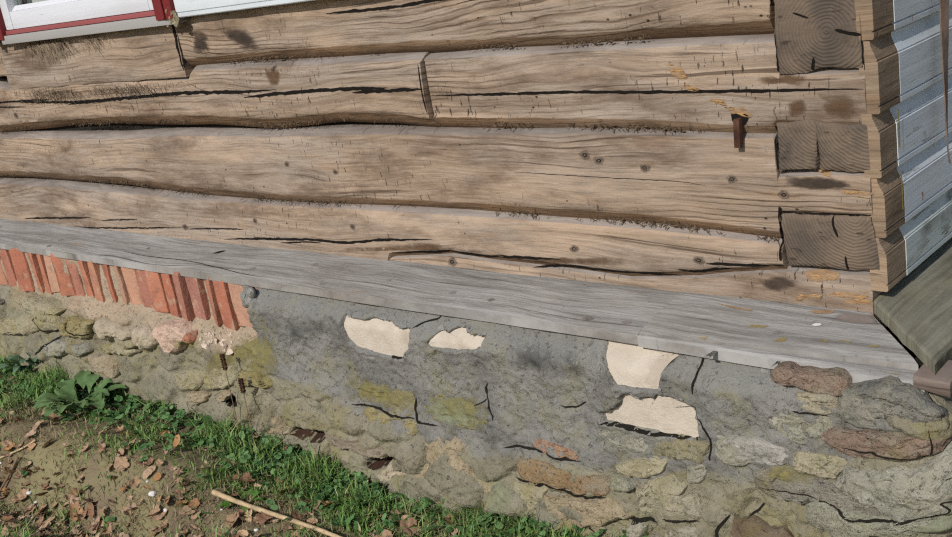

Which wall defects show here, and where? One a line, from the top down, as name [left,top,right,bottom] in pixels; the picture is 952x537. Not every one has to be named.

crack [326,0,443,14]
crack [835,28,861,36]
crack [0,58,856,108]
crack [24,217,783,277]
spalling [344,305,410,358]
spalling [429,322,487,350]
spalling [598,340,718,437]
crack [691,357,704,394]
crack [352,396,437,426]
crack [598,418,712,460]
crack [629,488,952,537]